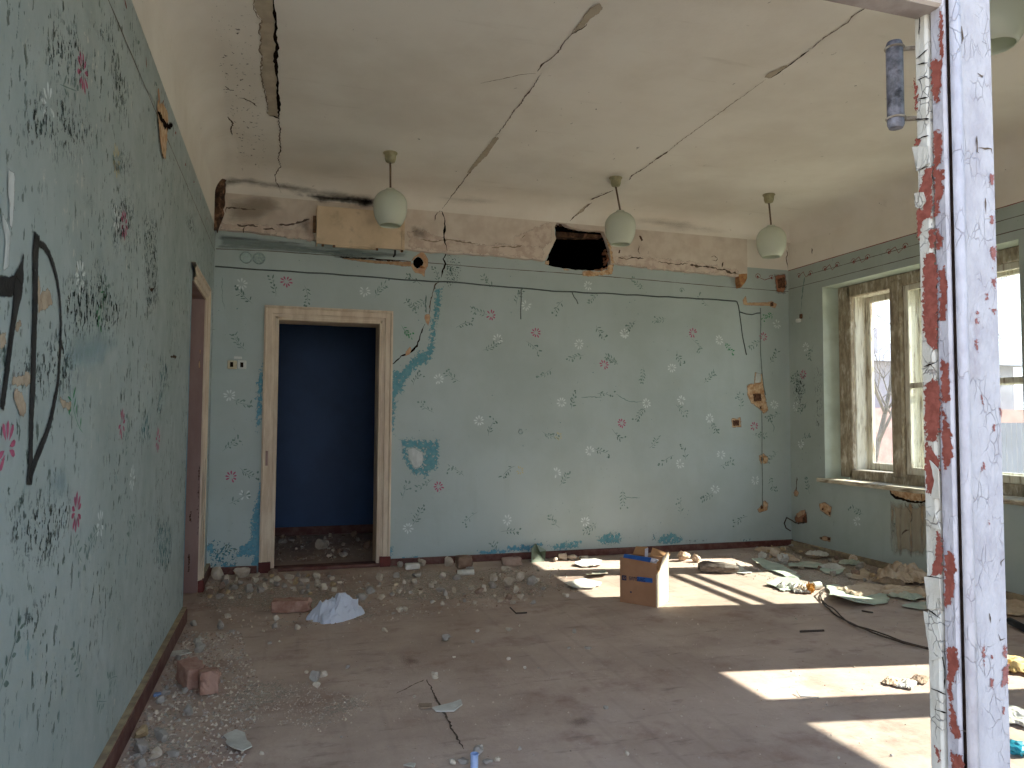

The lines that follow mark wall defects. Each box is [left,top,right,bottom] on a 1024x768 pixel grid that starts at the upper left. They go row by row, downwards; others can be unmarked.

crack [225,0,281,192]
crack [393,4,603,364]
crack [570,9,864,221]
peeling [912,11,944,111]
peeling [340,223,747,479]
spalling [747,372,768,414]
peeling [890,129,954,504]
peeling [975,246,997,324]
crack [397,680,464,749]
peeling [923,514,965,768]
peeling [981,645,1010,688]